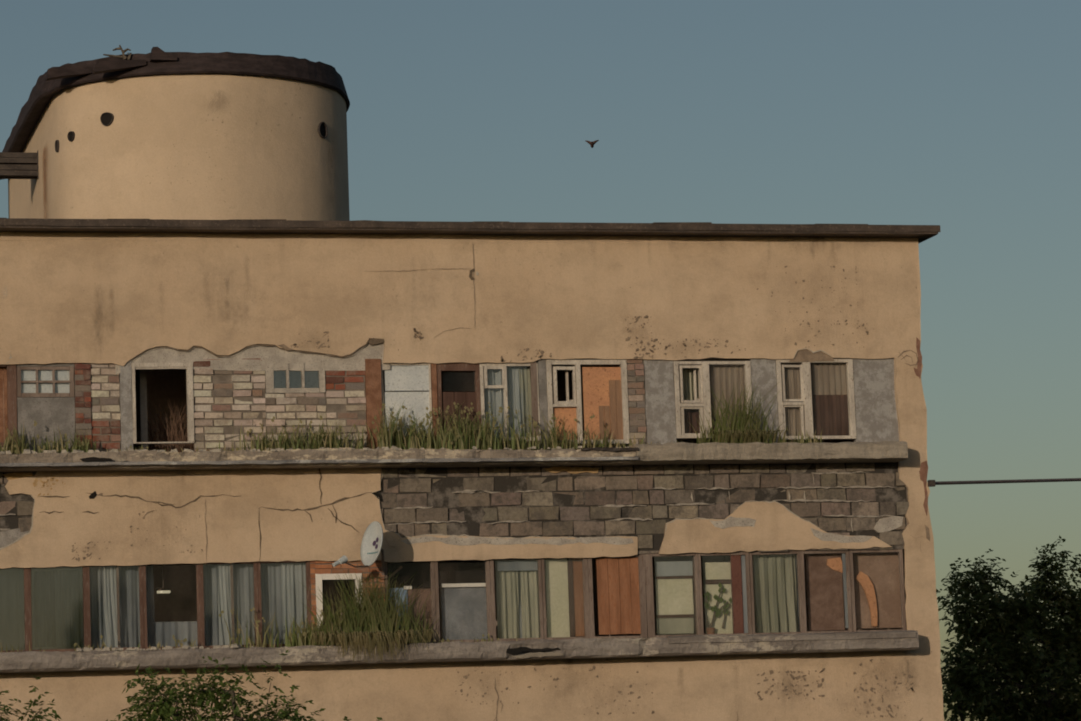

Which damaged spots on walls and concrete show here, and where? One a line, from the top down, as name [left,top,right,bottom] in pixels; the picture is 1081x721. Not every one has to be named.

flaking render [115,331,410,374]
flaking render [0,472,66,550]
crack [39,493,238,563]
crack [258,468,372,561]
flaking render [372,462,909,554]
flaking render [919,461,930,541]
spalling [387,560,486,589]